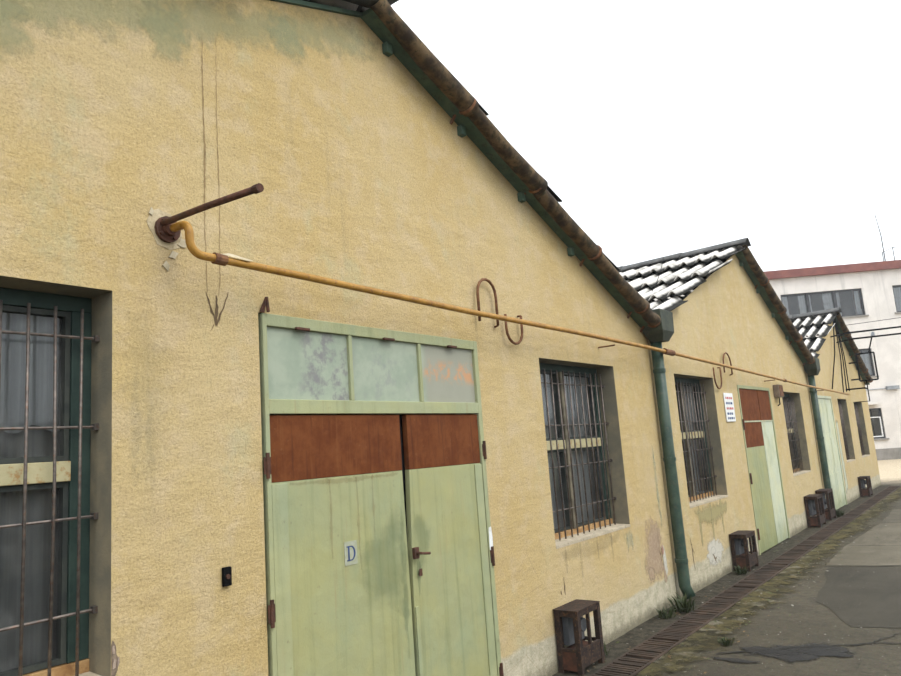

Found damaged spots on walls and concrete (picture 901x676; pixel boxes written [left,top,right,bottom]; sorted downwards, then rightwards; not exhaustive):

spalling [147,207,186,271]
peeling [646,521,667,582]